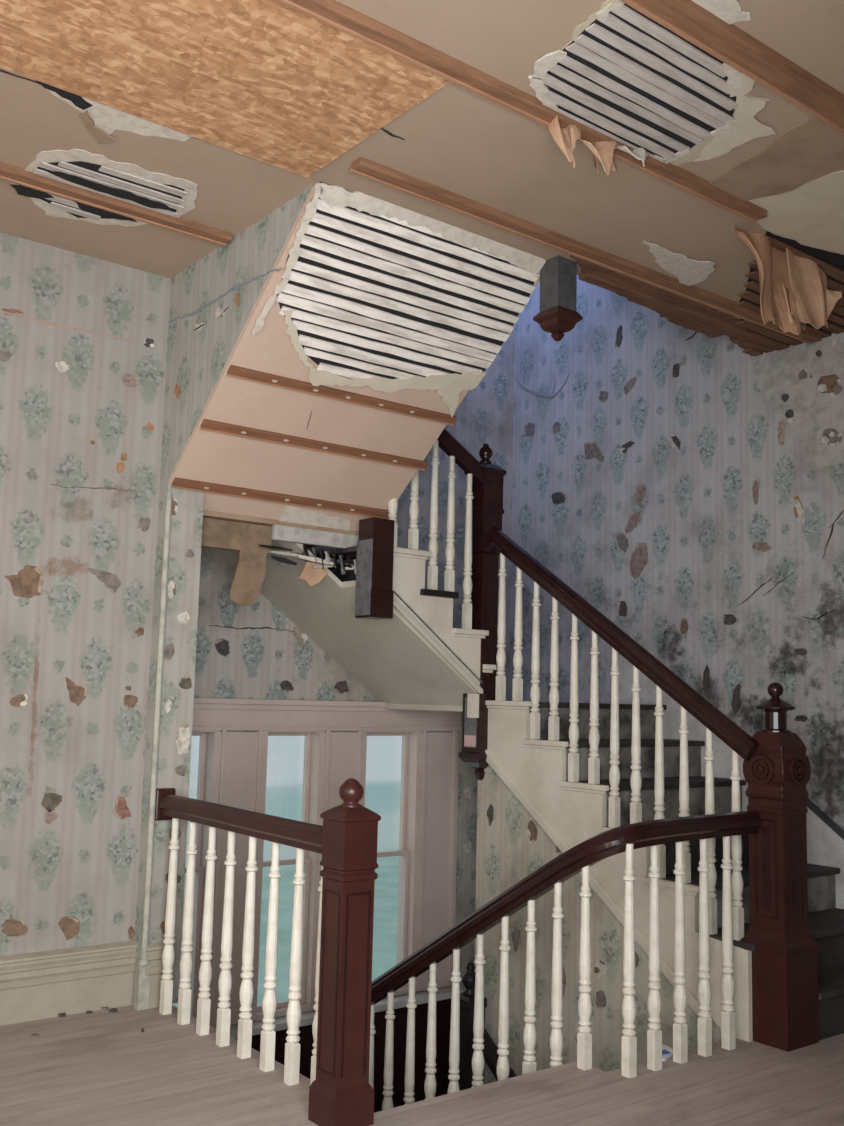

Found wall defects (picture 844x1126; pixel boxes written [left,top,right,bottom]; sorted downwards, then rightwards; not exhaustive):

flaking render [47,89,192,142]
spalling [39,194,87,218]
spalling [37,161,185,212]
peeling [529,0,844,472]
spalling [277,197,534,379]
leakage [818,592,844,638]
leakage [771,643,804,673]
leakage [810,720,844,817]